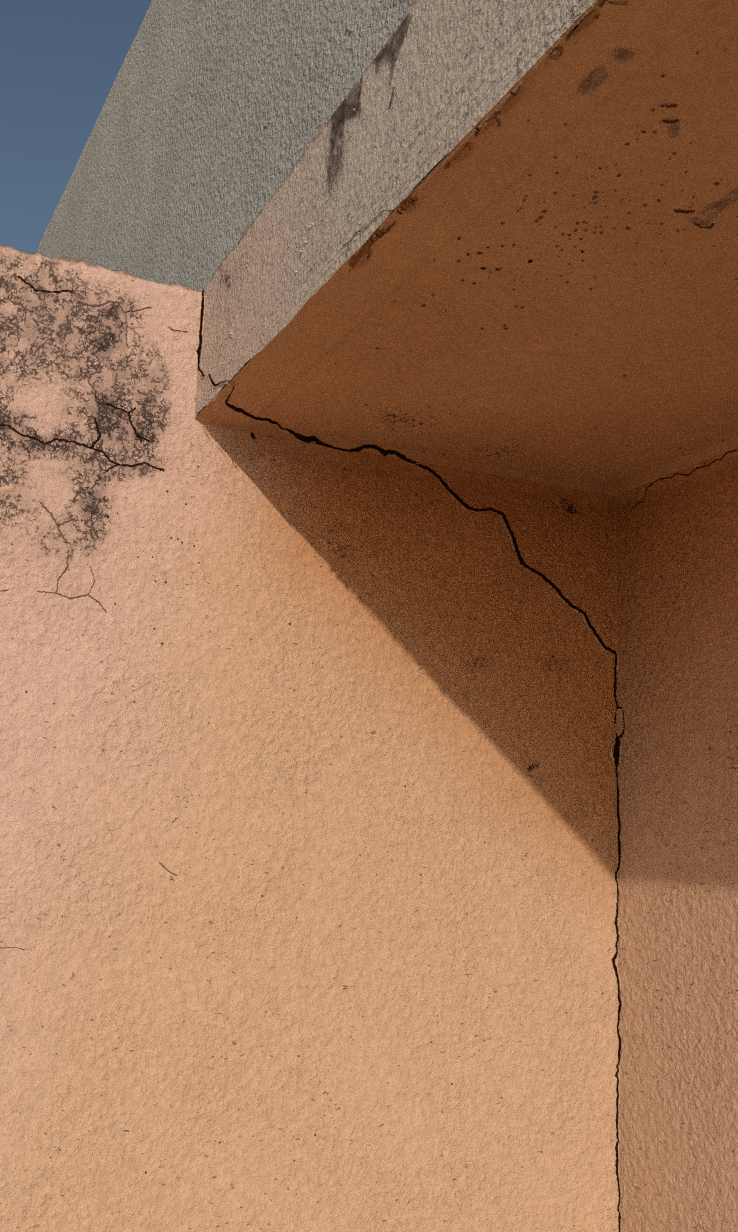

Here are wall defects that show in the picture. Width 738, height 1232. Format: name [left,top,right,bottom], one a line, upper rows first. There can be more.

damp [373,13,411,85]
damp [328,76,362,184]
crack [342,210,392,258]
damp [0,255,171,559]
crack [630,449,738,511]
crack [0,260,625,1232]